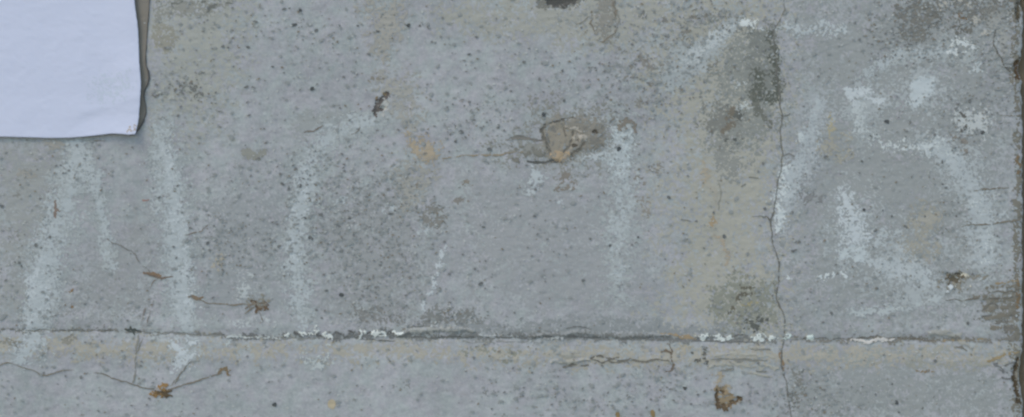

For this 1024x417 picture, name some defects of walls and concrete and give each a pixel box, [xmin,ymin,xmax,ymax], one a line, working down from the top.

spalling [508,112,604,164]
crack [718,0,943,417]
crack [94,238,749,391]